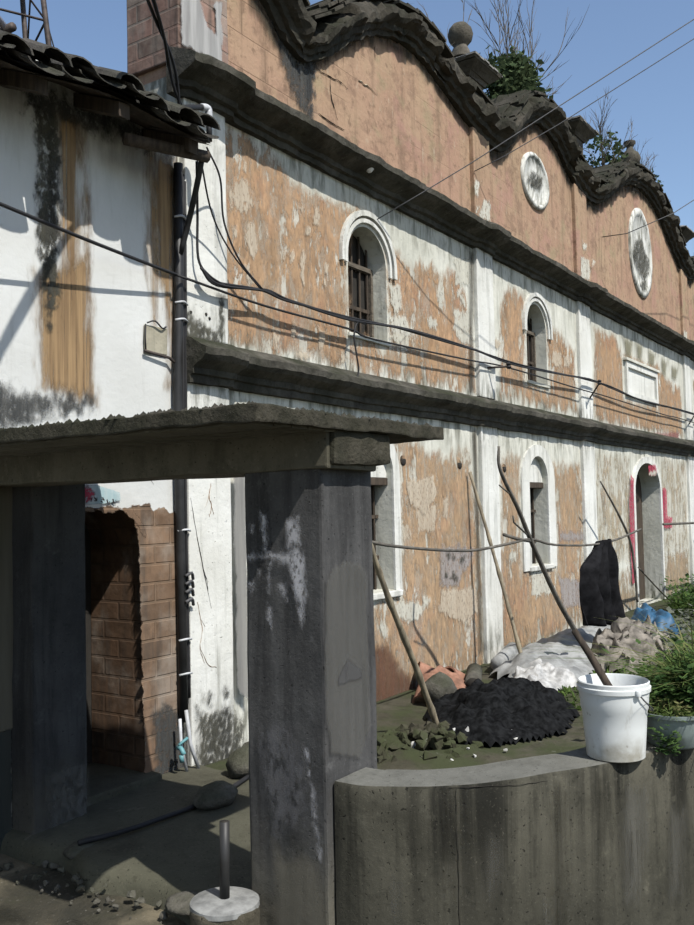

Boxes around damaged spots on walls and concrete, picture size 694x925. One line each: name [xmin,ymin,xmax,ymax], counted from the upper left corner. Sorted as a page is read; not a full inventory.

crack [317,68,375,130]
mould [26,89,149,331]
peeling [475,180,491,221]
corrosion [39,117,94,401]
peeling [389,283,411,352]
peeling [453,258,471,344]
water stain [0,382,94,428]
crack [191,487,217,668]
peeling [394,544,478,625]
peeling [531,570,580,608]
flaking render [85,503,183,774]
mould [153,688,244,774]